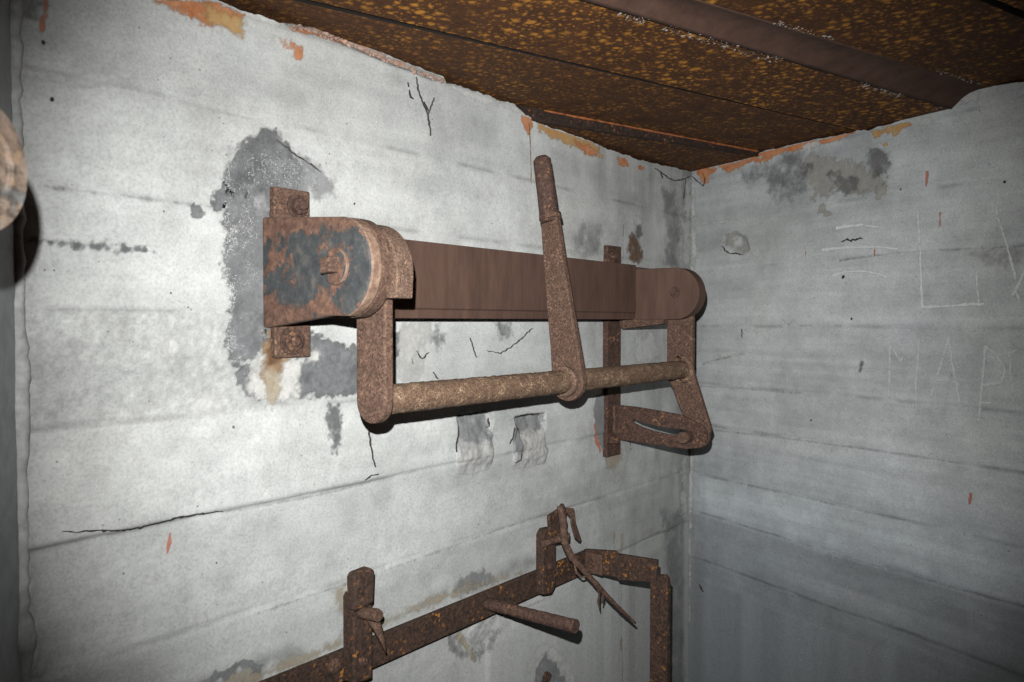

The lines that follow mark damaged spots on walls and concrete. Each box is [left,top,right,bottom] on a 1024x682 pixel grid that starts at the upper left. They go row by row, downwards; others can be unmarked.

corrosion [284,42,303,60]
crack [407,77,435,136]
corrosion [521,116,603,183]
crack [654,168,705,199]
corrosion [544,110,855,183]
damp [750,155,813,190]
damp [869,149,891,178]
corrosion [872,122,912,146]
damp [191,128,357,402]
crack [470,328,533,357]
corrosion [260,330,289,404]
crack [63,511,224,533]